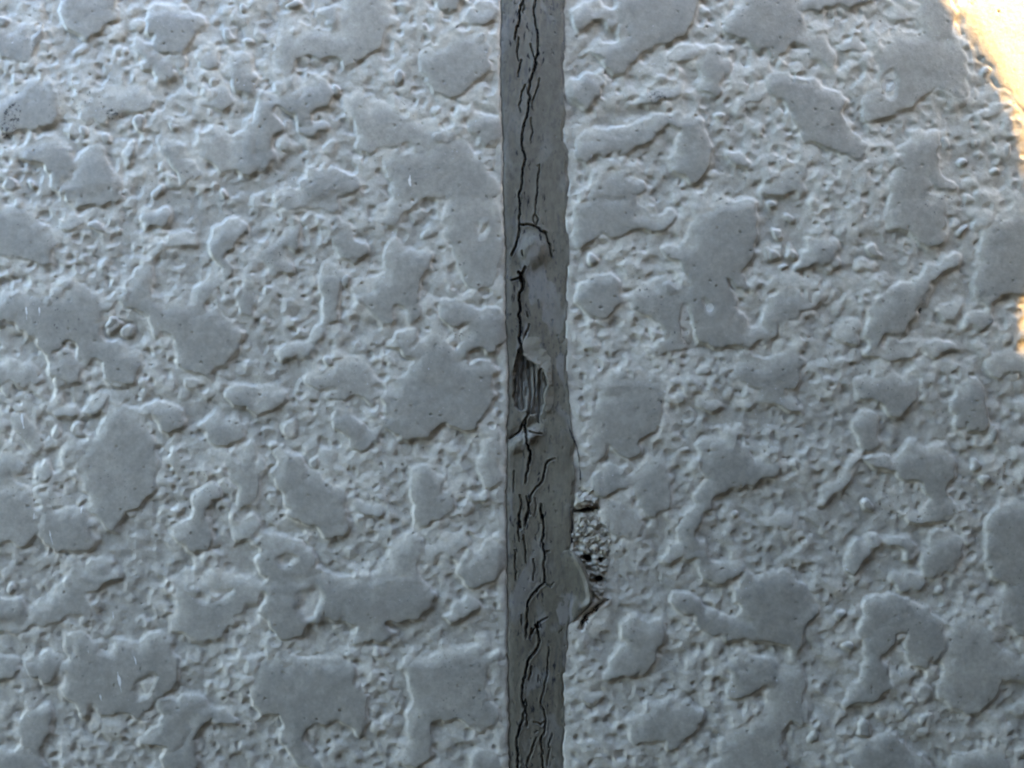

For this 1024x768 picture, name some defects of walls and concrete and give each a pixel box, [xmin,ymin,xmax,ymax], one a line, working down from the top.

crack [509,0,555,360]
crack [509,411,556,768]
peeling [513,335,554,421]
spalling [570,485,611,600]